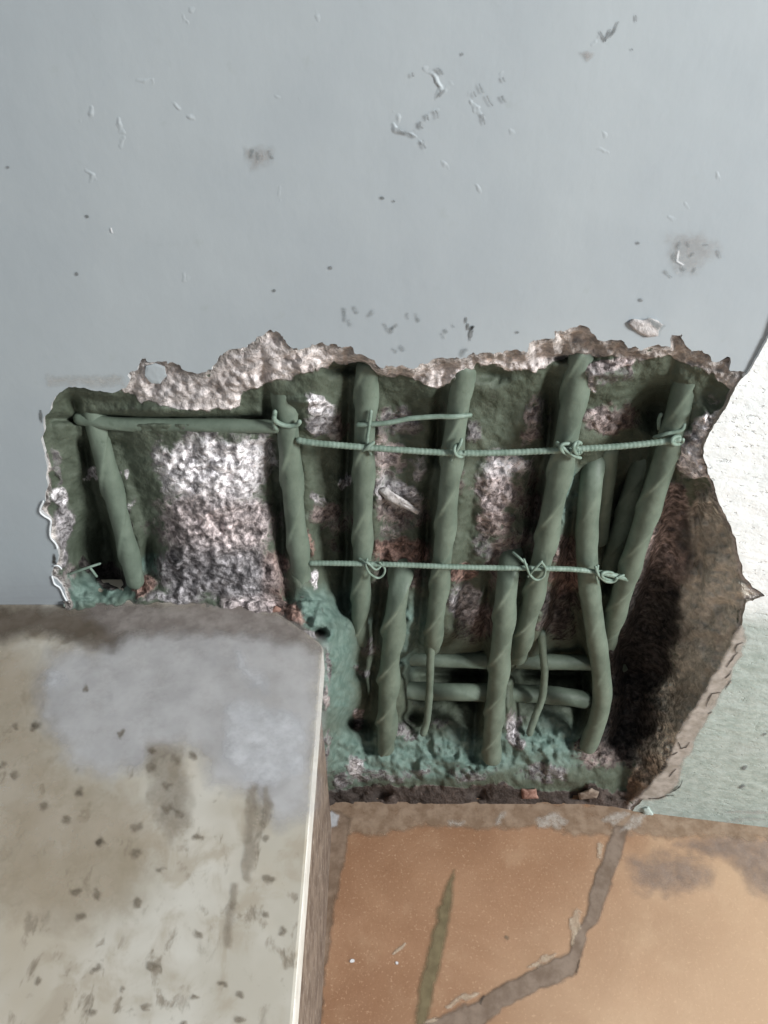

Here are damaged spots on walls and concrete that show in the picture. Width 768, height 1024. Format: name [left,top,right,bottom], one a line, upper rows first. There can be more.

spalling [39,318,763,810]
leakage [44,630,317,820]
crack [425,826,628,1024]